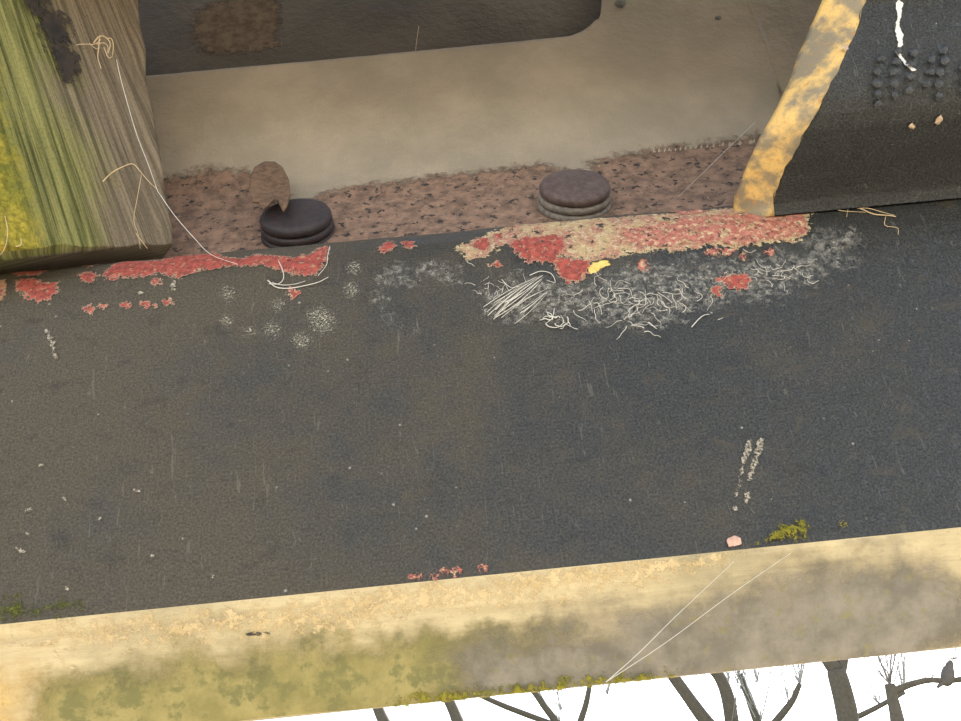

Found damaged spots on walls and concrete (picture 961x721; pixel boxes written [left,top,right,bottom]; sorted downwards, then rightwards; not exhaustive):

peeling [78,246,331,315]
peeling [454,208,814,284]
peeling [709,272,752,297]
leakage [35,551,961,721]